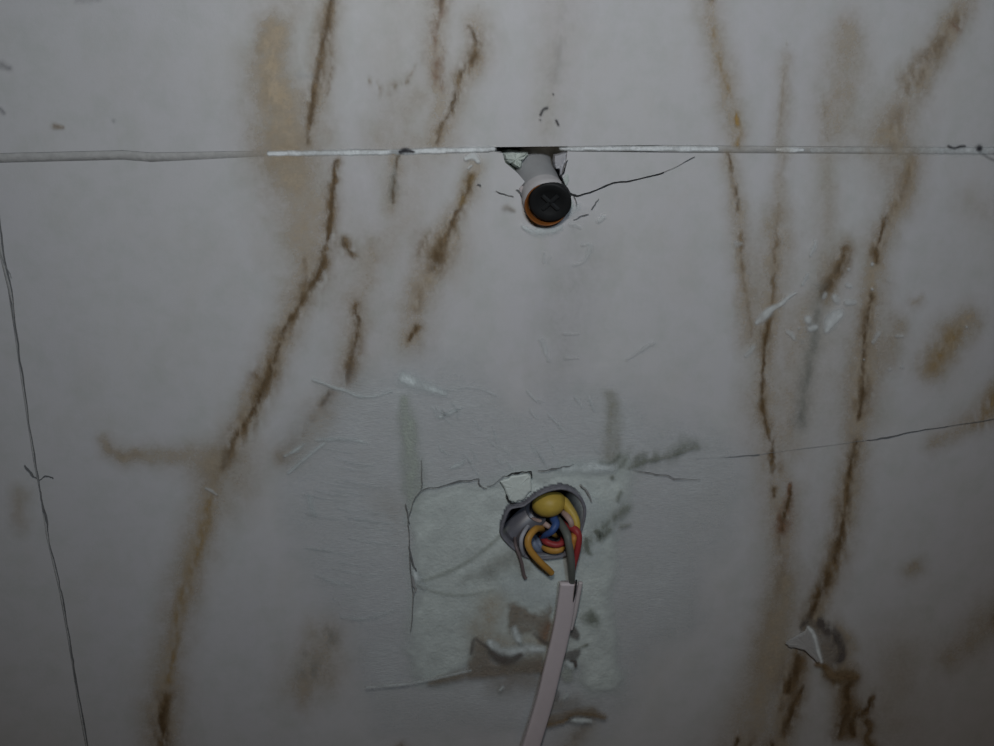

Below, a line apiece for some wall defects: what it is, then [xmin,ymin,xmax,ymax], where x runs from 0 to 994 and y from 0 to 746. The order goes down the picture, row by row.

crack [571,156,695,220]
corrosion [403,164,479,346]
corrosion [148,1,338,746]
crack [405,460,505,632]
spalling [500,471,532,504]
corrosion [729,157,793,573]
crack [720,419,993,458]
corrosion [807,156,916,623]
spalling [367,605,551,691]
spalling [564,627,588,668]
spalling [785,618,860,681]
corrosion [831,626,875,746]